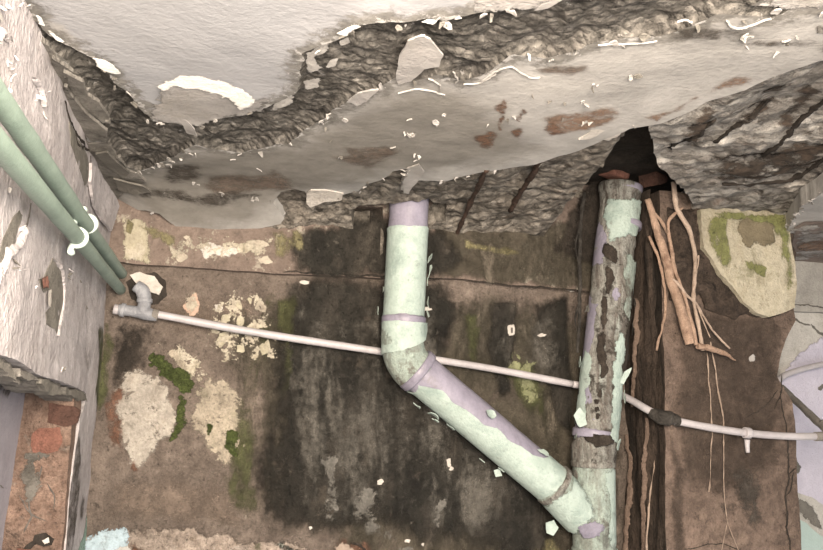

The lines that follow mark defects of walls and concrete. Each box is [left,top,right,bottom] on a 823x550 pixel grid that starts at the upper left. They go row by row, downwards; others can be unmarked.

spalling [35,258,82,336]
water stain [105,327,177,471]
water stain [167,209,573,550]
spalling [0,0,789,264]
spalling [246,121,625,355]
corrosion [475,101,507,148]
water stain [424,181,601,470]
corrosion [545,109,615,135]
spalling [649,61,823,320]
water stain [721,211,793,289]
water stain [116,482,237,522]
peeling [126,526,308,550]